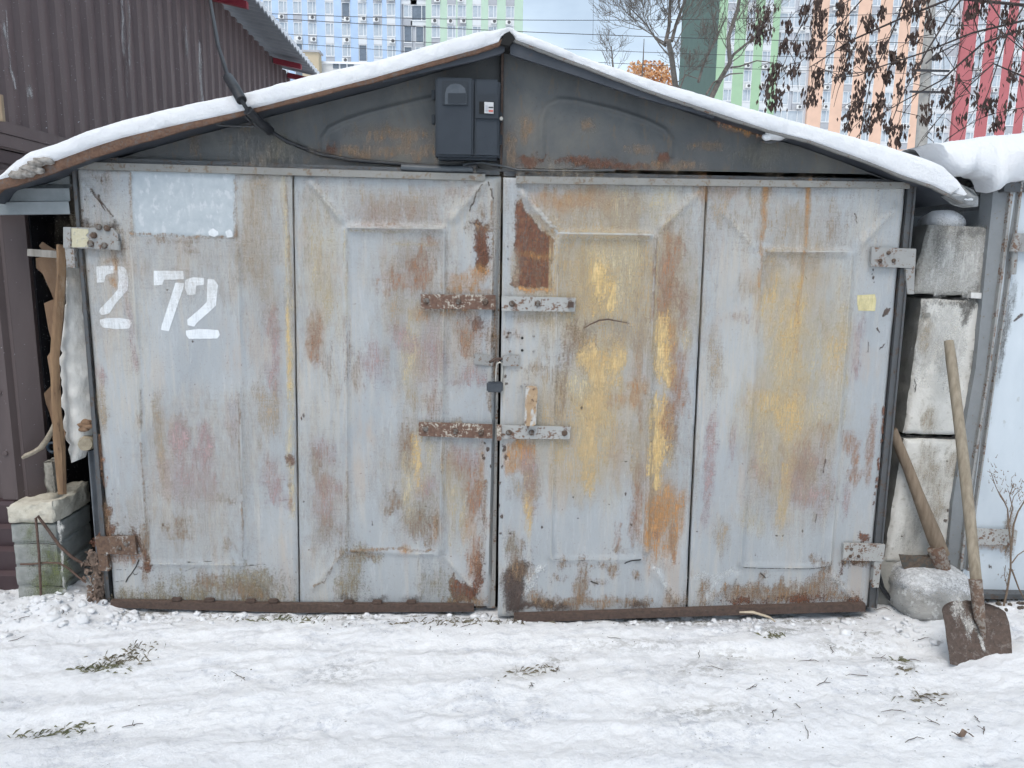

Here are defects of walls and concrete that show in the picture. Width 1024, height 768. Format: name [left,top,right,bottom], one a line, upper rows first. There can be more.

rust [519,152,695,171]
rust [454,201,494,292]
rust [507,200,555,293]
rust [90,505,295,601]
rust [412,537,485,605]
rust [635,483,685,580]
rust [499,532,869,612]